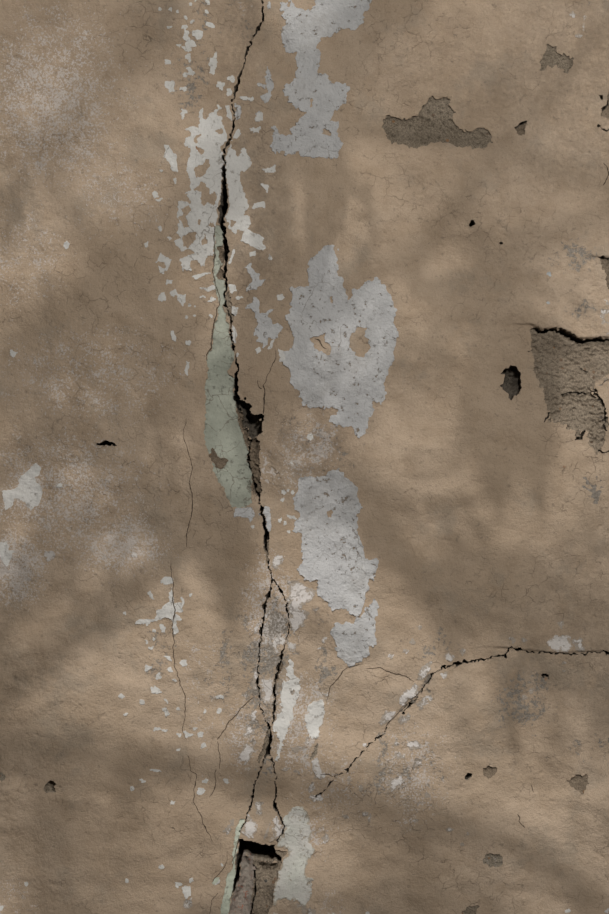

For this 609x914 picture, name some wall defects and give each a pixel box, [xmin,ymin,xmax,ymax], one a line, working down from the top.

flaking render [382,96,493,149]
flaking render [597,92,609,132]
flaking render [598,256,609,289]
flaking render [500,366,520,400]
flaking render [528,300,609,455]
crack [170,1,290,842]
peeling [153,0,399,914]
peeling [135,576,192,650]
peeling [139,656,188,716]
peeling [378,648,465,726]
crack [316,646,609,796]
peeling [386,740,422,792]